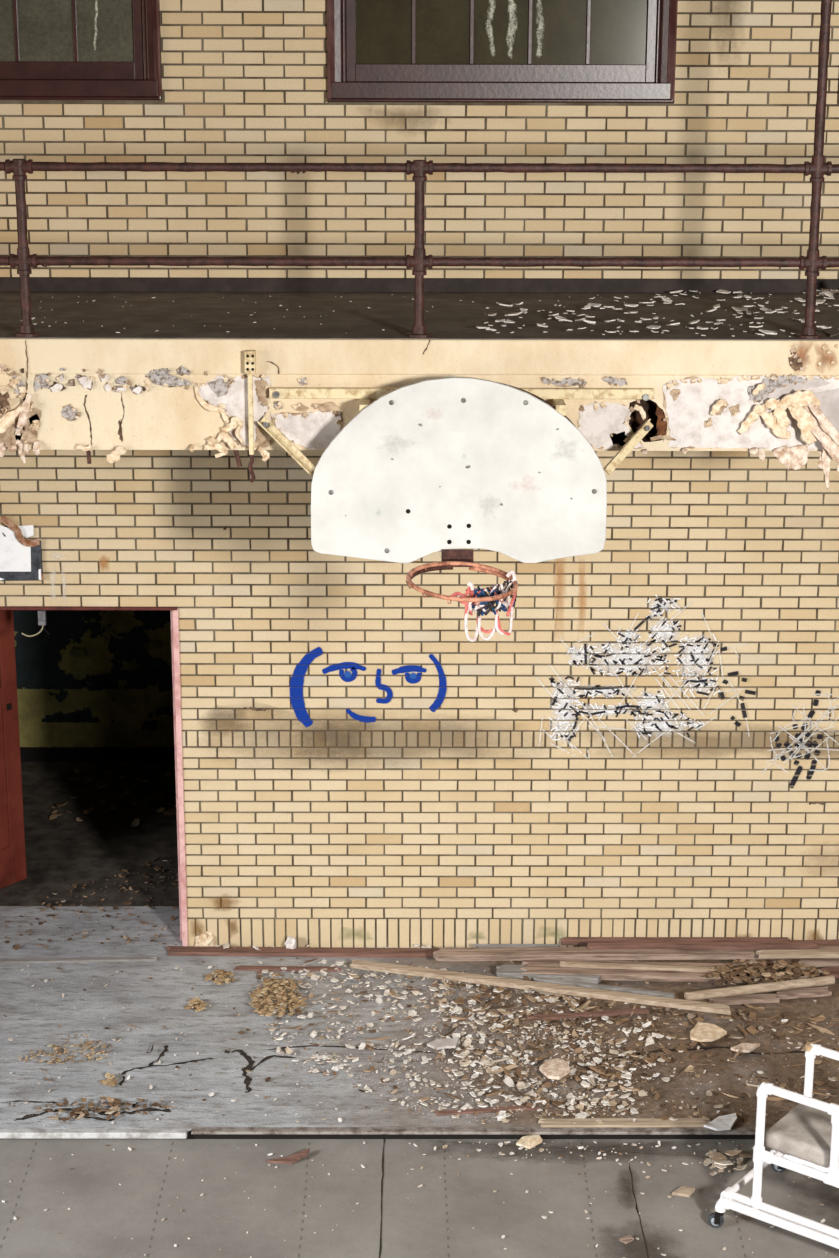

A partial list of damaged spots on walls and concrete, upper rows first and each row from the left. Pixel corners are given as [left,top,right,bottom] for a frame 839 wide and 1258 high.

peeling [0,364,343,464]
peeling [540,377,587,388]
peeling [577,373,839,489]
crack [0,1045,432,1121]